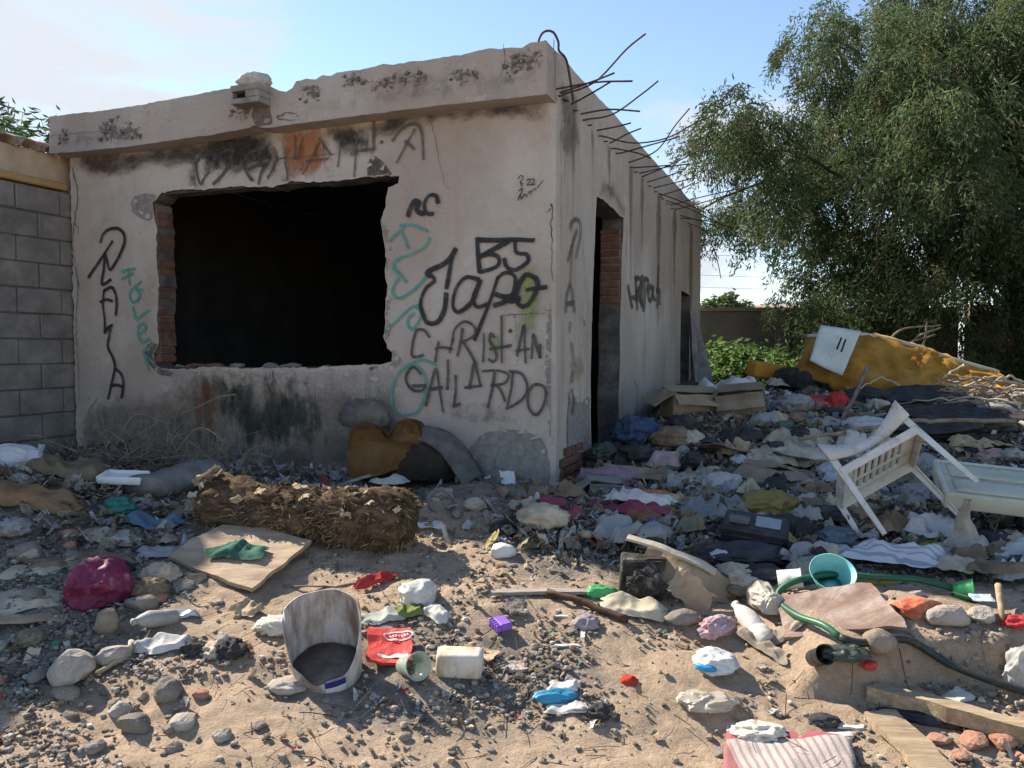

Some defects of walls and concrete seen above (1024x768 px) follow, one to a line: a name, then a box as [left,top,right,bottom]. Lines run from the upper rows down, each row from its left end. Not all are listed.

peeling [342,70,426,91]
peeling [449,69,478,82]
leakage [86,384,388,467]